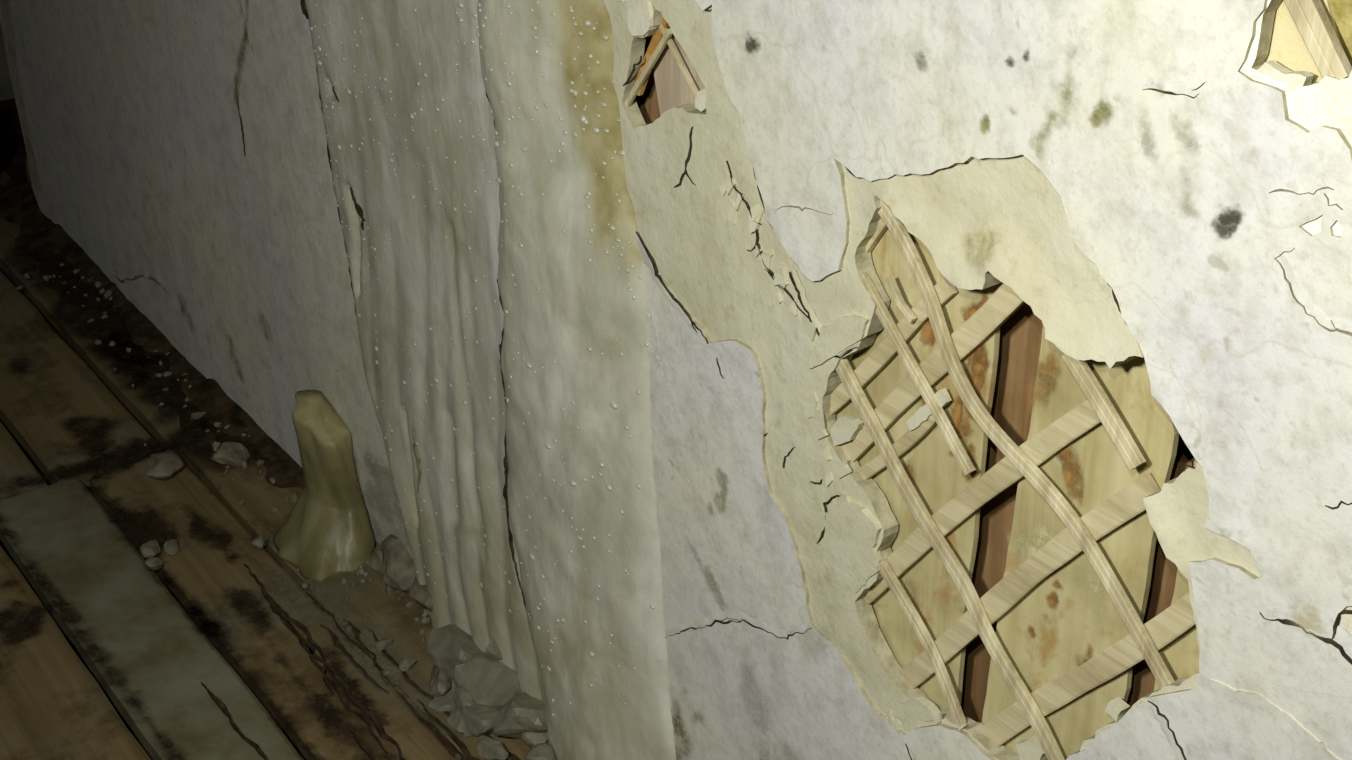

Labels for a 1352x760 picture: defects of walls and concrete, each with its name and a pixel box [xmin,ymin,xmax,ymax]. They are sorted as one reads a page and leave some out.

spalling [1240,0,1352,146]
crack [236,90,246,156]
crack [673,127,695,188]
water stain [1092,103,1110,126]
crack [726,161,858,358]
mould [1213,210,1241,238]
spalling [603,0,1262,760]
water stain [0,252,321,760]
water stain [271,572,453,760]
crack [665,612,812,640]
crack [1259,608,1352,665]
crack [1210,680,1341,760]